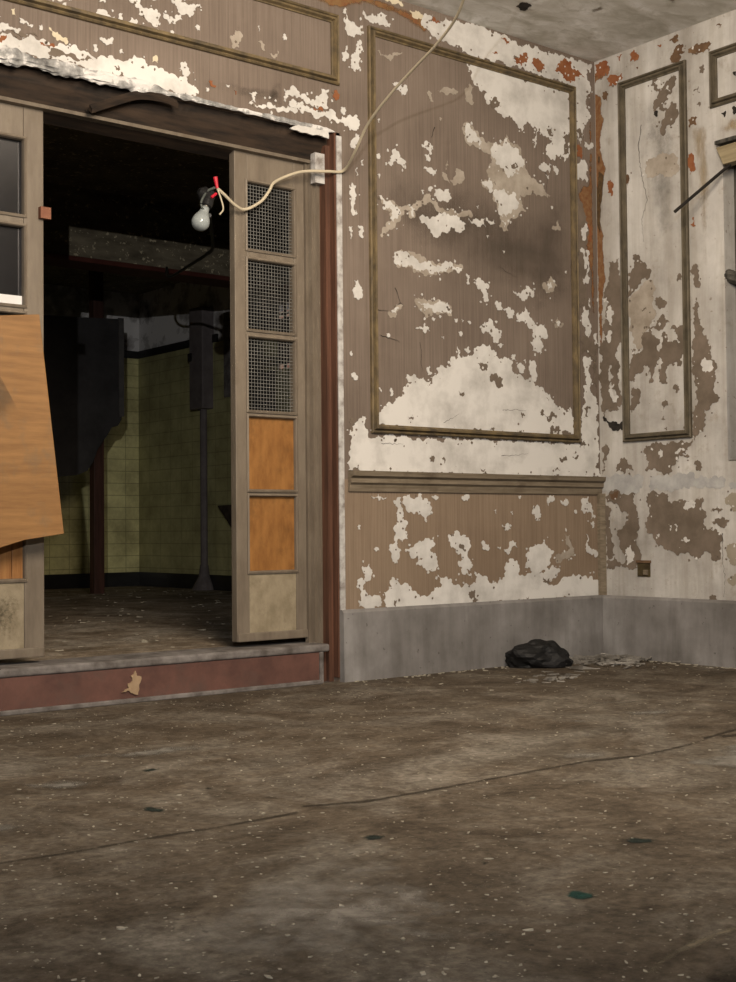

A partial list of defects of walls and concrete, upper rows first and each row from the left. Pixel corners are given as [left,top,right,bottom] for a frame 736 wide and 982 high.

peeling [96,0,202,33]
peeling [342,8,394,72]
rust [321,0,427,31]
peeling [657,34,711,63]
peeling [377,0,639,238]
peeling [648,75,701,136]
peeling [349,159,364,238]
peeling [626,152,696,185]
peeling [580,223,590,284]
rust [577,74,622,417]
peeling [347,249,736,608]